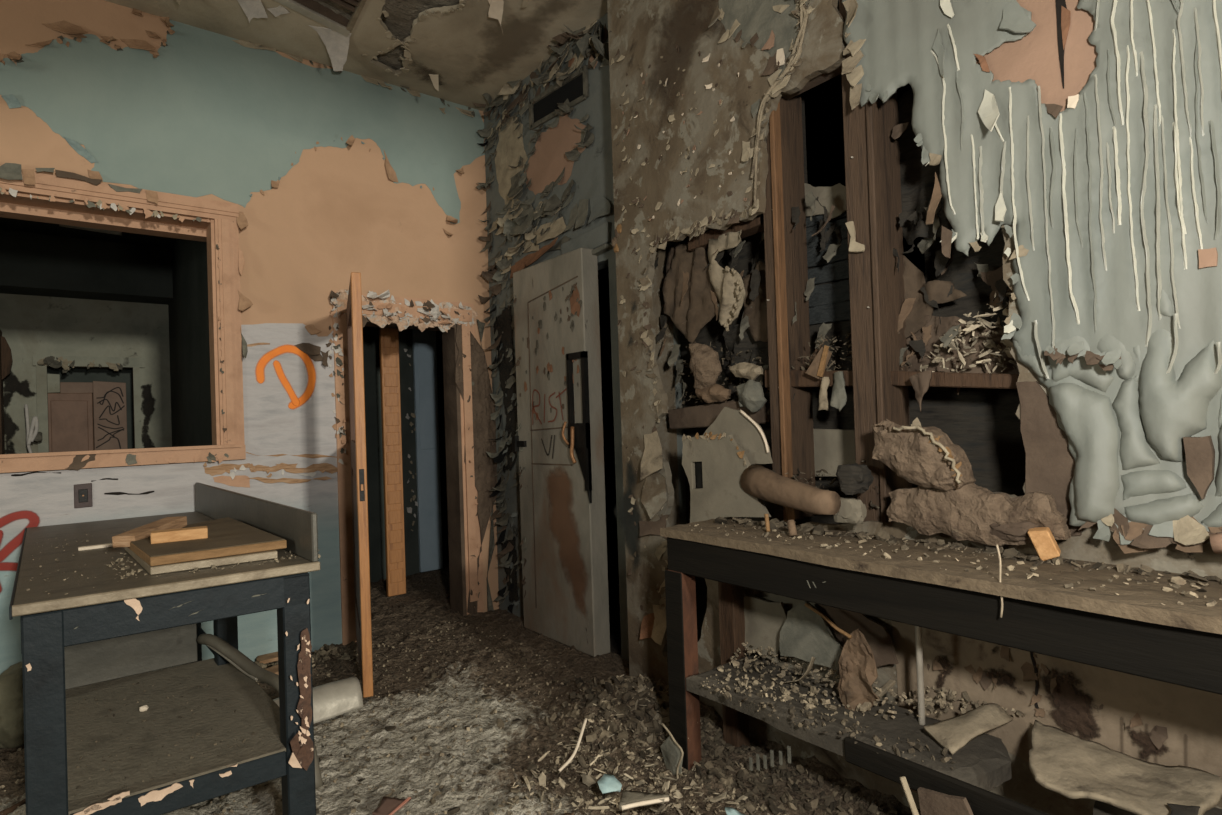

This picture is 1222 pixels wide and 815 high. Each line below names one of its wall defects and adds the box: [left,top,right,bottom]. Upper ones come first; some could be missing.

peeling [708,0,815,208]
crack [1056,0,1071,89]
peeling [0,0,669,645]
peeling [842,0,1222,554]
peeling [73,779,194,815]